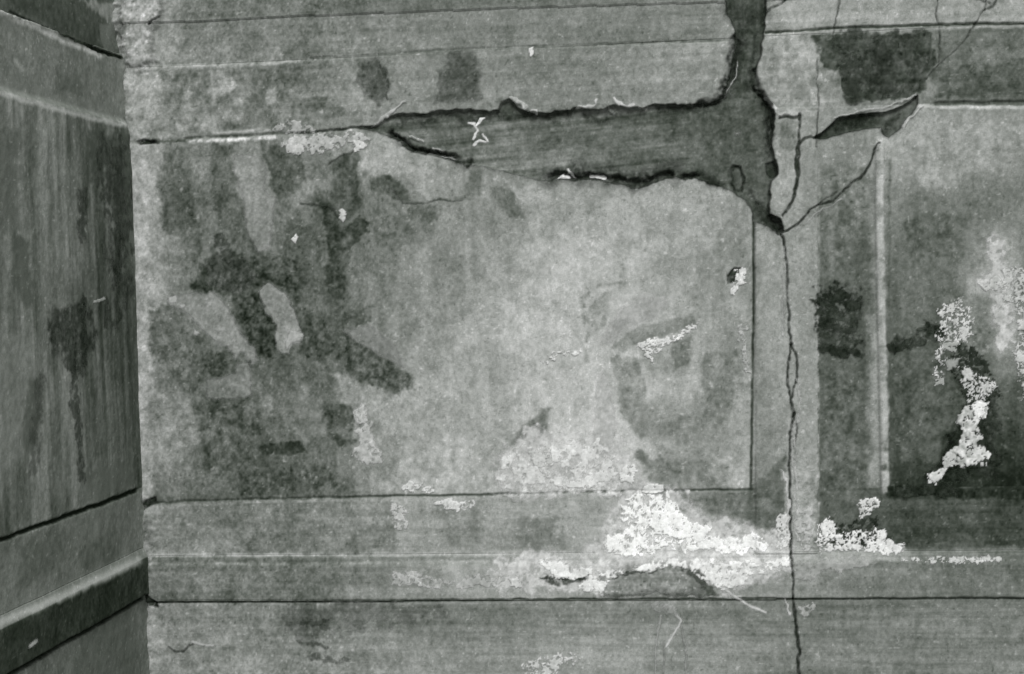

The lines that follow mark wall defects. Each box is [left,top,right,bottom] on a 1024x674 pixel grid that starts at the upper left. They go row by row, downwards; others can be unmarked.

water stain [839,27,930,105]
flaking render [362,0,790,235]
flaking render [813,94,924,139]
water stain [203,233,256,292]
flaking render [727,268,741,283]
water stain [811,280,863,359]
water stain [977,234,1024,398]
water stain [352,403,383,465]
crack [779,114,880,674]
water stain [887,298,1001,500]
water stain [391,423,1002,615]